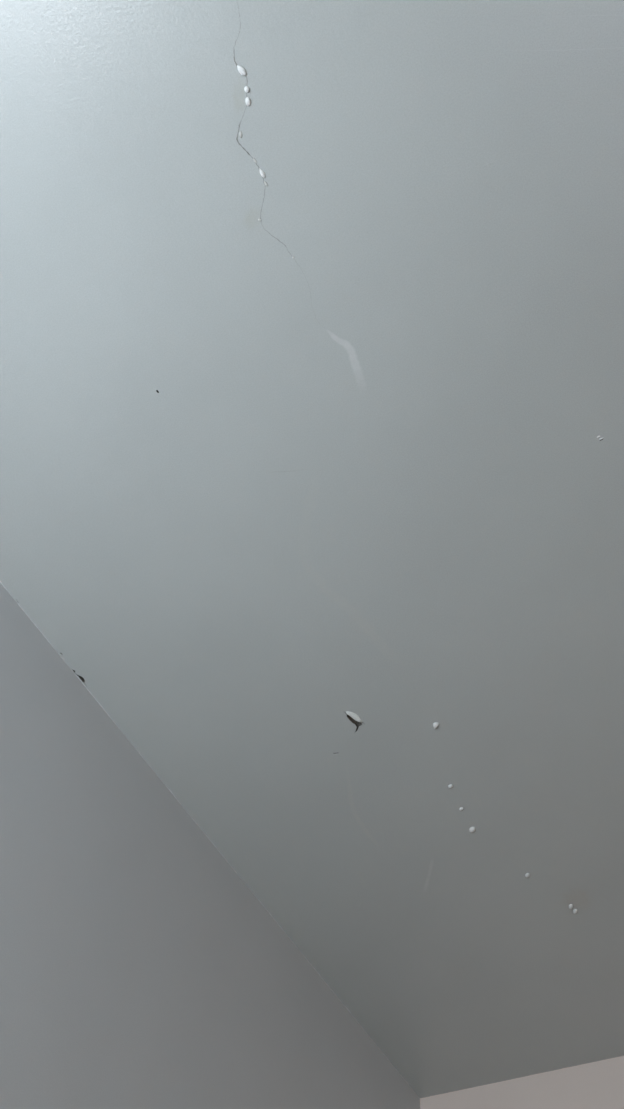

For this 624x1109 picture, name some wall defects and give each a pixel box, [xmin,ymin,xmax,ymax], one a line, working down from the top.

crack [229,0,326,329]
peeling [343,711,365,734]